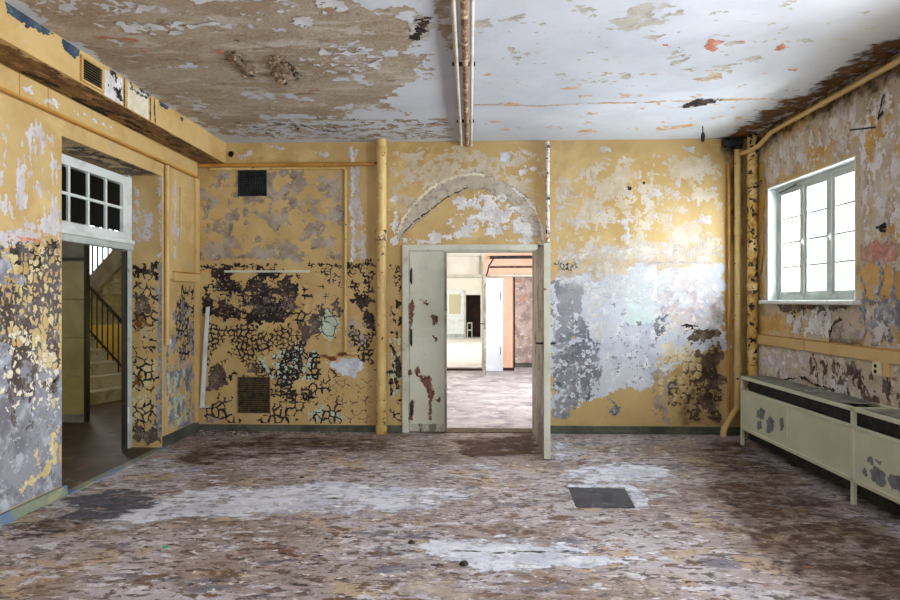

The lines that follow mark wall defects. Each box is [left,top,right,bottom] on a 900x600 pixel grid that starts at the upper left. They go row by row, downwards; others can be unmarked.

peeling [0,119,194,513]
crack [132,117,448,440]
peeling [0,0,732,426]
peeling [589,3,814,82]
damp [720,37,900,156]
peeling [756,72,900,349]
peeling [758,345,900,409]